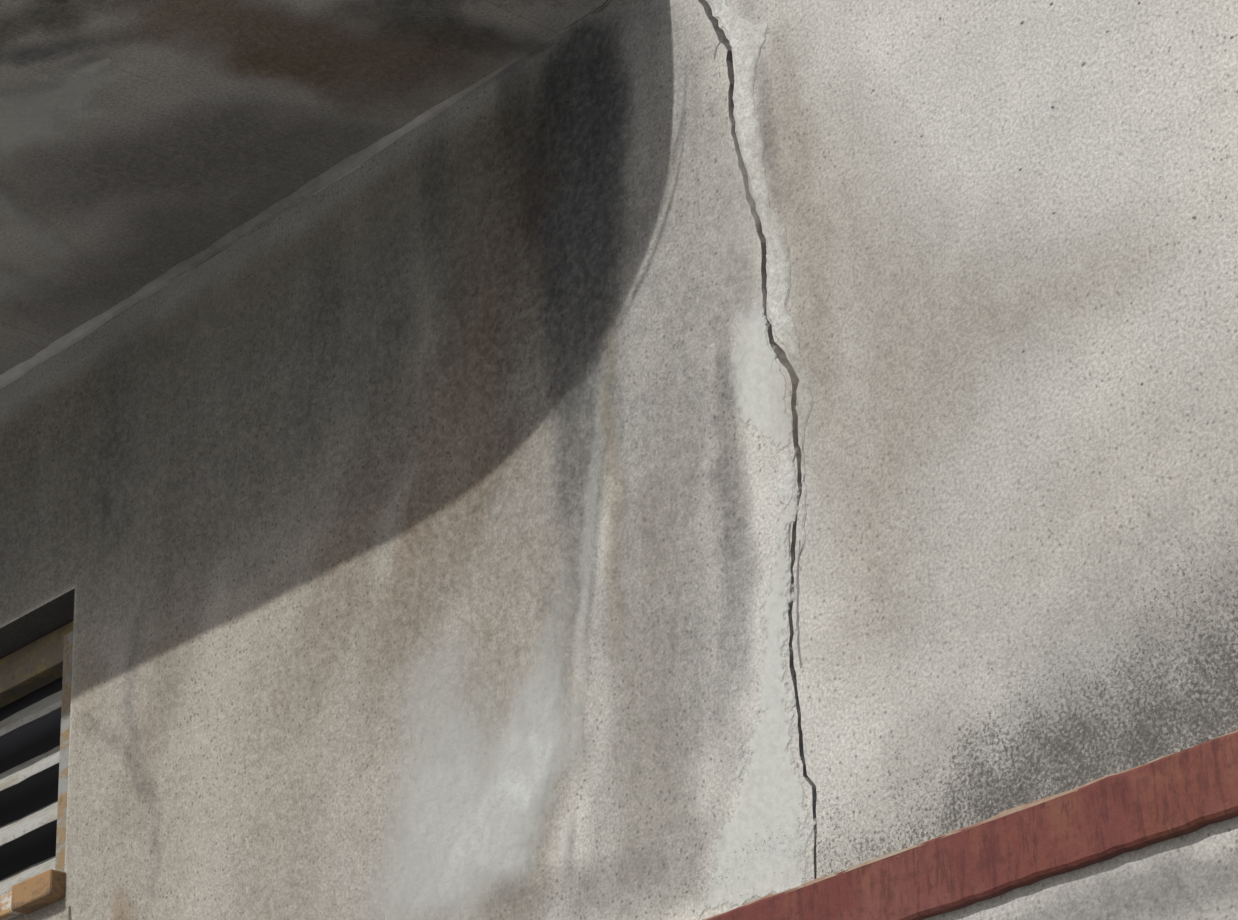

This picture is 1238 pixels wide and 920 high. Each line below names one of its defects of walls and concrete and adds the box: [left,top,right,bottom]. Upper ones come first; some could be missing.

crack [698,0,817,879]
damp [730,301,793,451]
damp [671,470,1238,917]